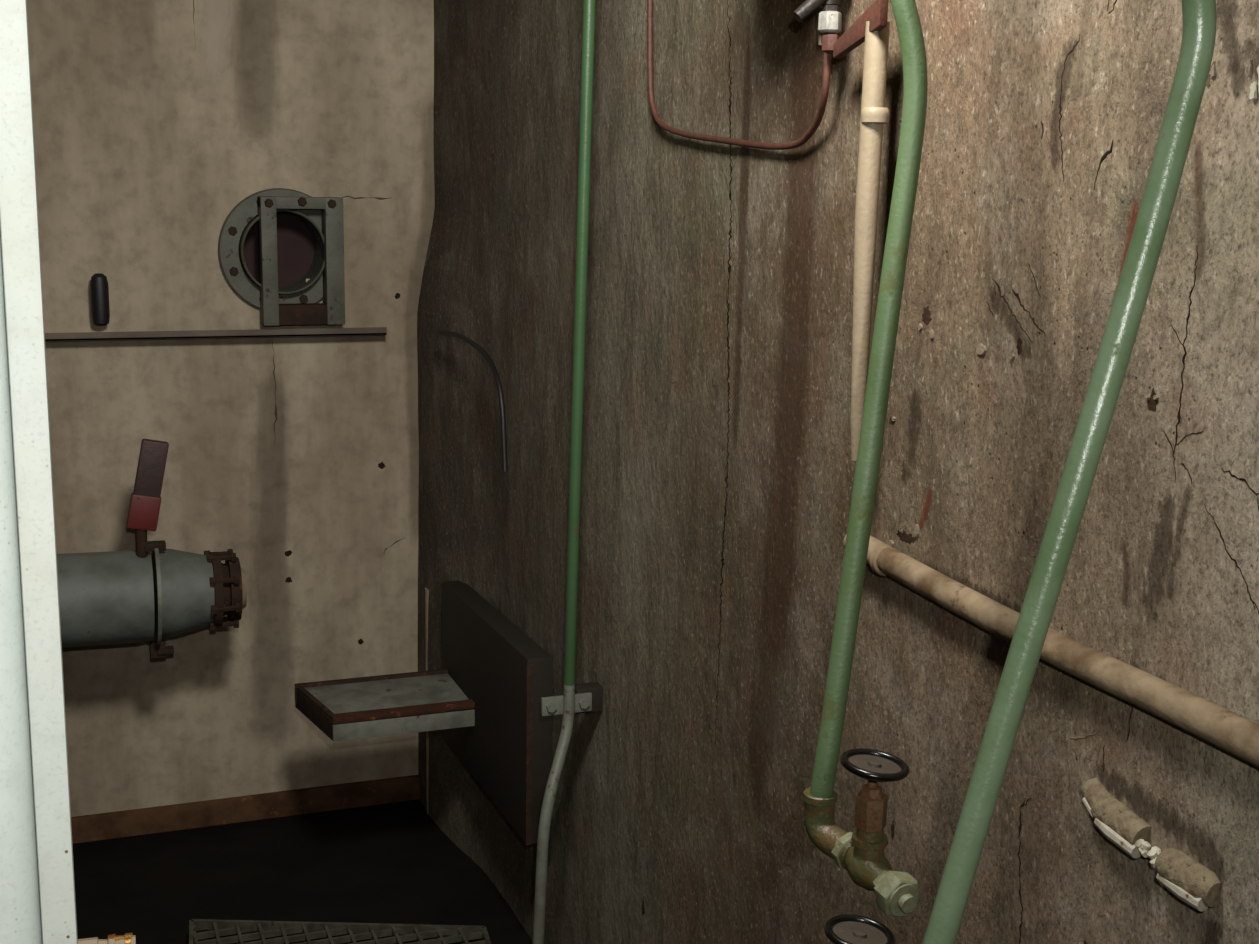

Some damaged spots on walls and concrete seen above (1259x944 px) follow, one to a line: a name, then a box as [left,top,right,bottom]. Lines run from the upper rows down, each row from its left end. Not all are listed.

crack [1164,245,1259,614]